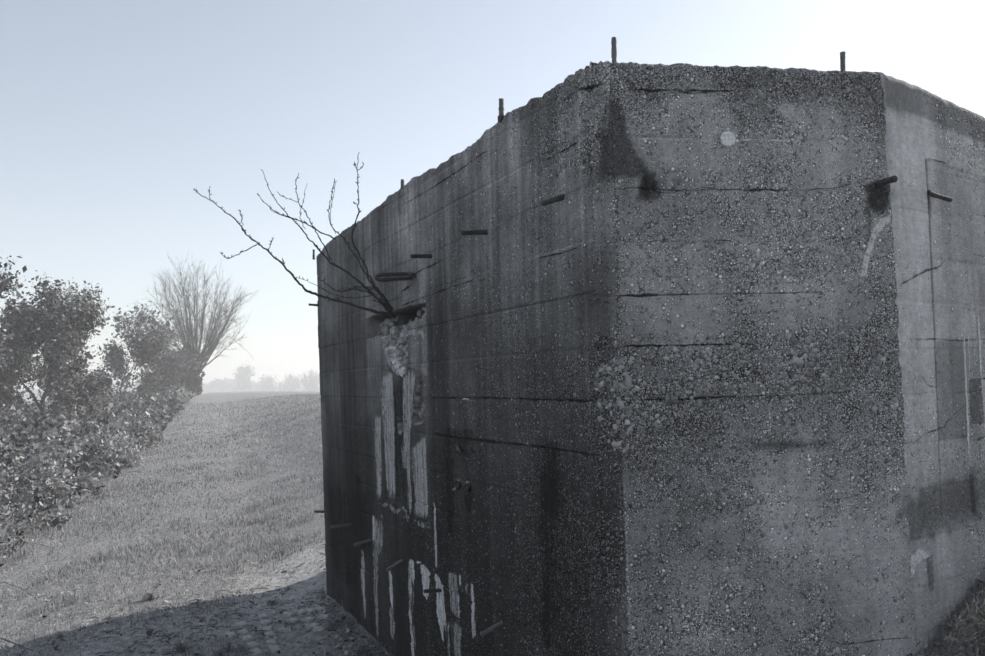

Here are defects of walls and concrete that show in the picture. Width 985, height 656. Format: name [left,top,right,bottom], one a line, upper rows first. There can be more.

leakage [602,101,648,177]
peeling [369,307,430,529]